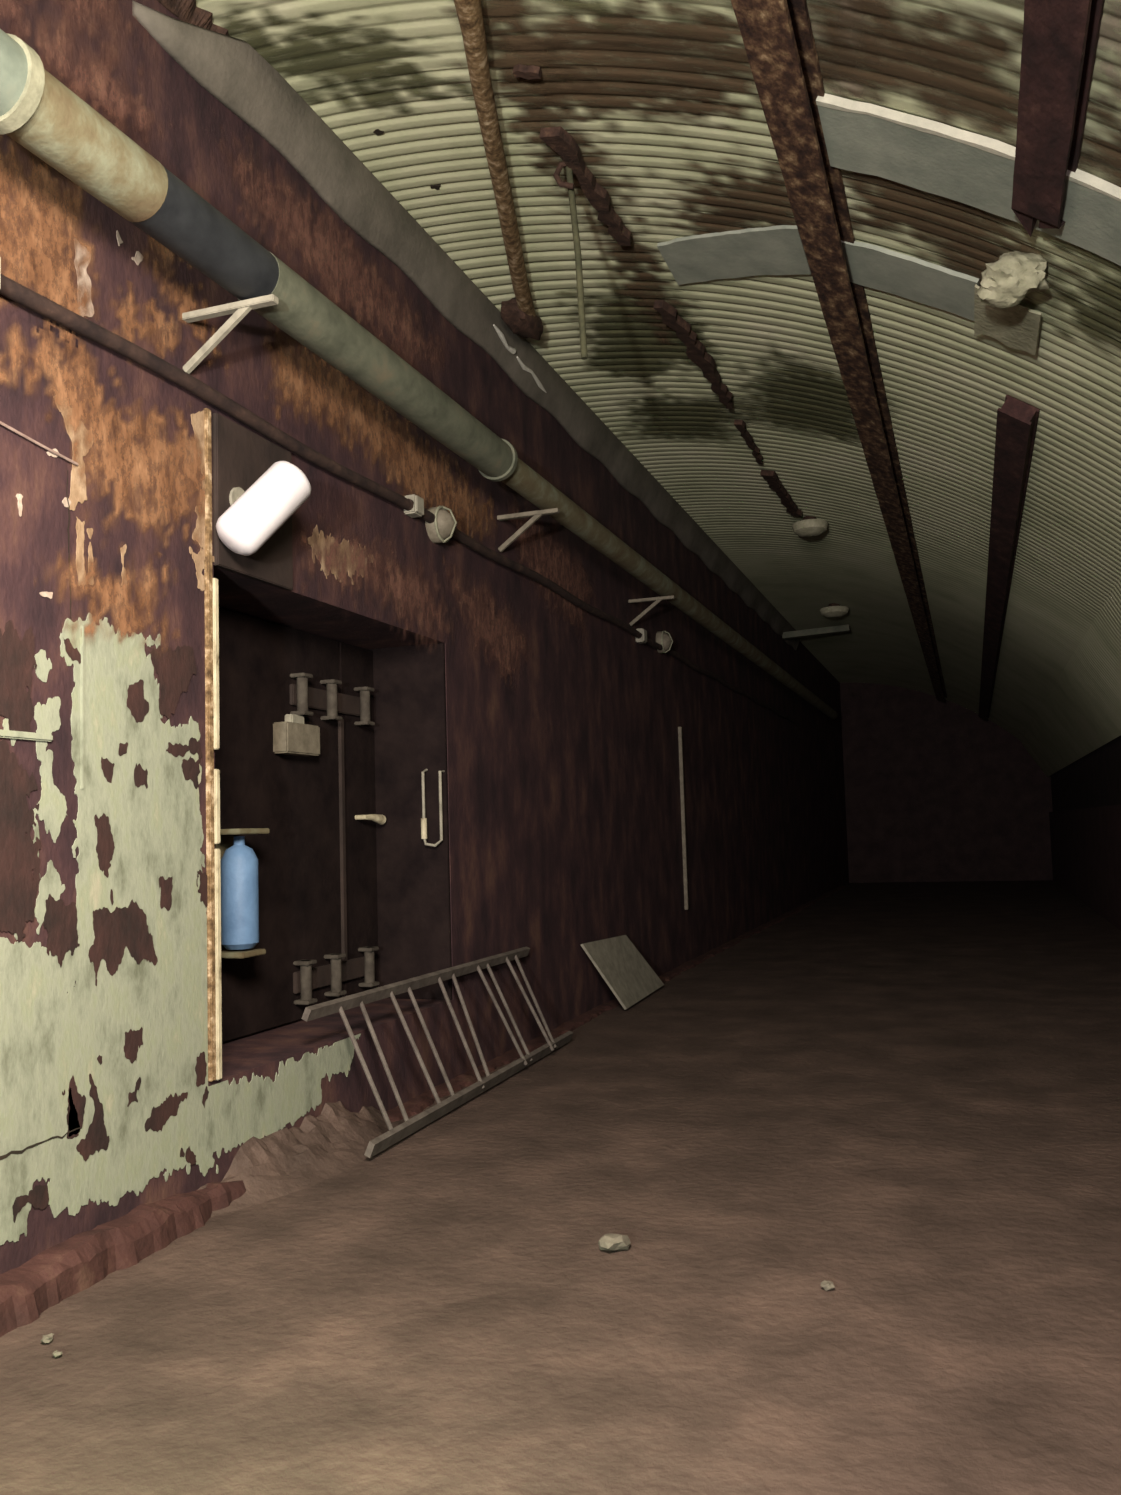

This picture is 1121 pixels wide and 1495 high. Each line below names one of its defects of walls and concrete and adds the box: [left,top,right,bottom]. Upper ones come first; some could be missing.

damp [220,9,472,114]
damp [806,0,1023,146]
damp [1078,0,1121,187]
peeling [74,243,94,317]
rust [0,141,205,542]
peeling [116,230,144,265]
rust [115,236,221,365]
damp [481,0,858,443]
damp [841,171,1121,355]
peeling [46,396,94,586]
peeling [189,411,214,591]
peeling [0,613,361,1245]